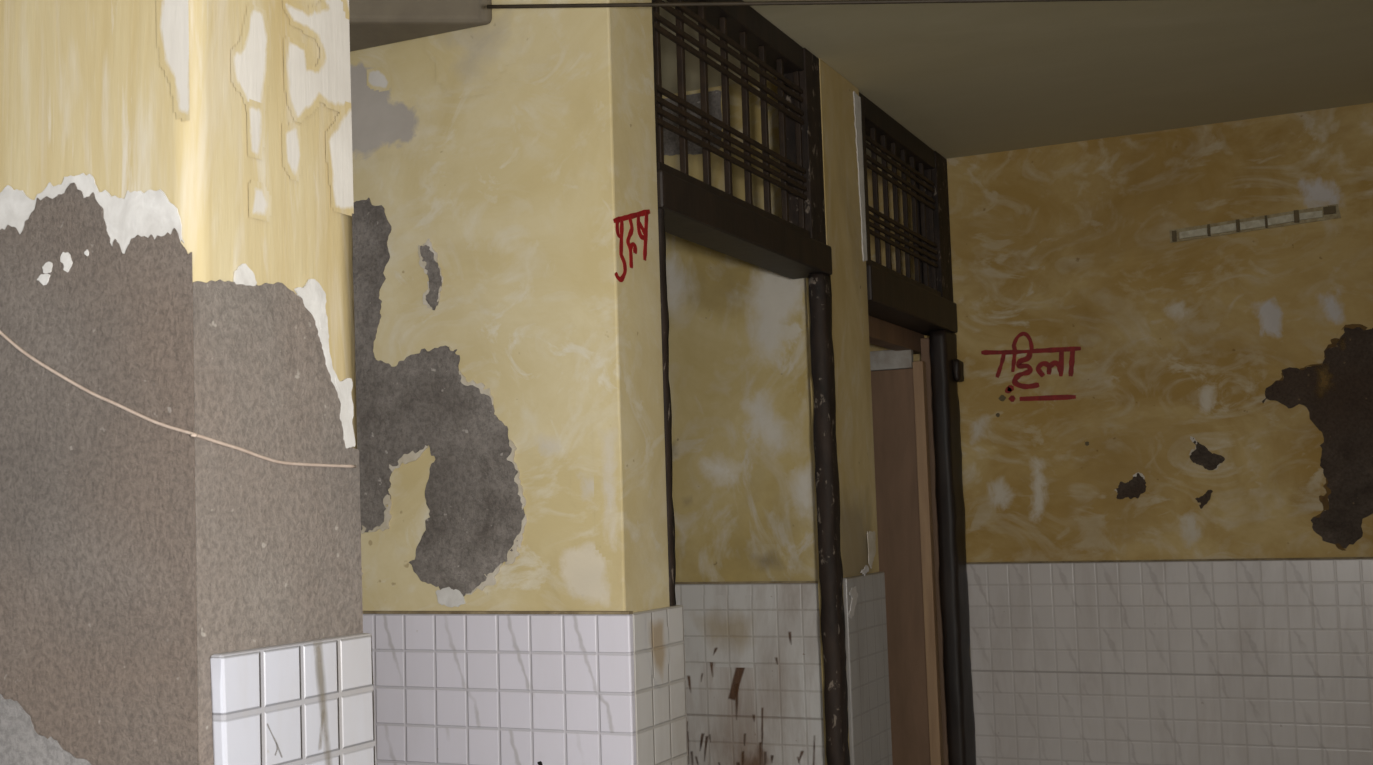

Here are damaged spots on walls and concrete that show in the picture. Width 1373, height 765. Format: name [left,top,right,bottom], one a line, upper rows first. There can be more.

flaking render [0,0,527,765]
flaking render [1115,472,1147,499]
peeling [1245,289,1293,346]
flaking render [1262,281,1373,551]
rust [645,584,825,765]